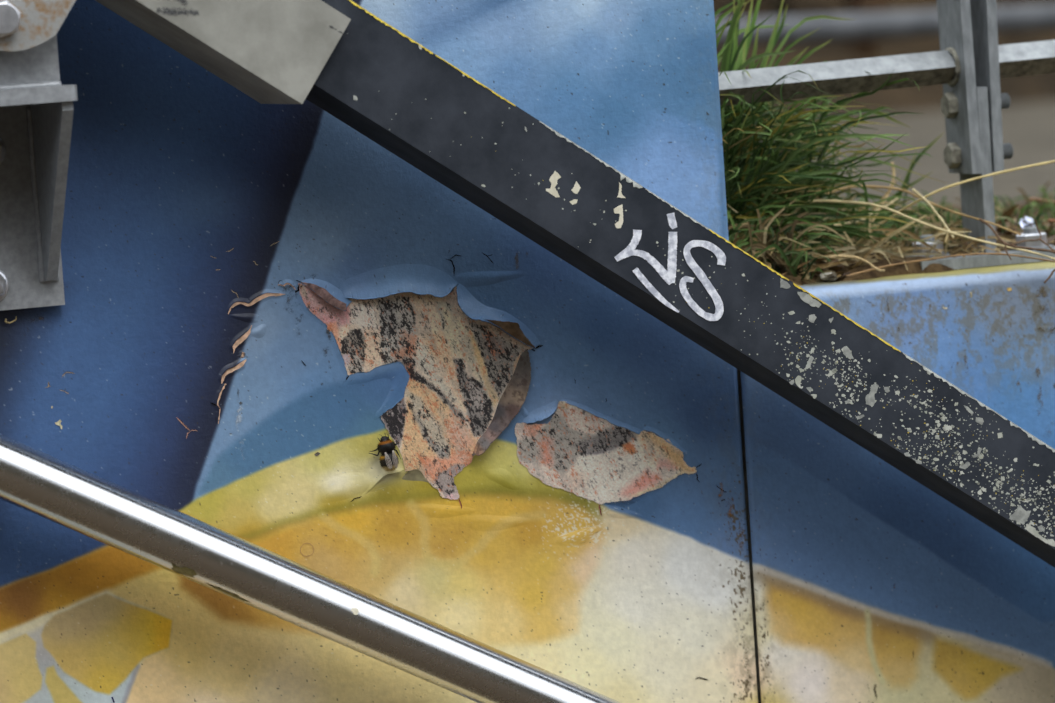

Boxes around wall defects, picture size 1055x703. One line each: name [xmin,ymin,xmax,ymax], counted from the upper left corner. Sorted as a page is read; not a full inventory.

spalling [525,120,709,230]
peeling [296,264,697,507]
peeling [738,278,1055,547]